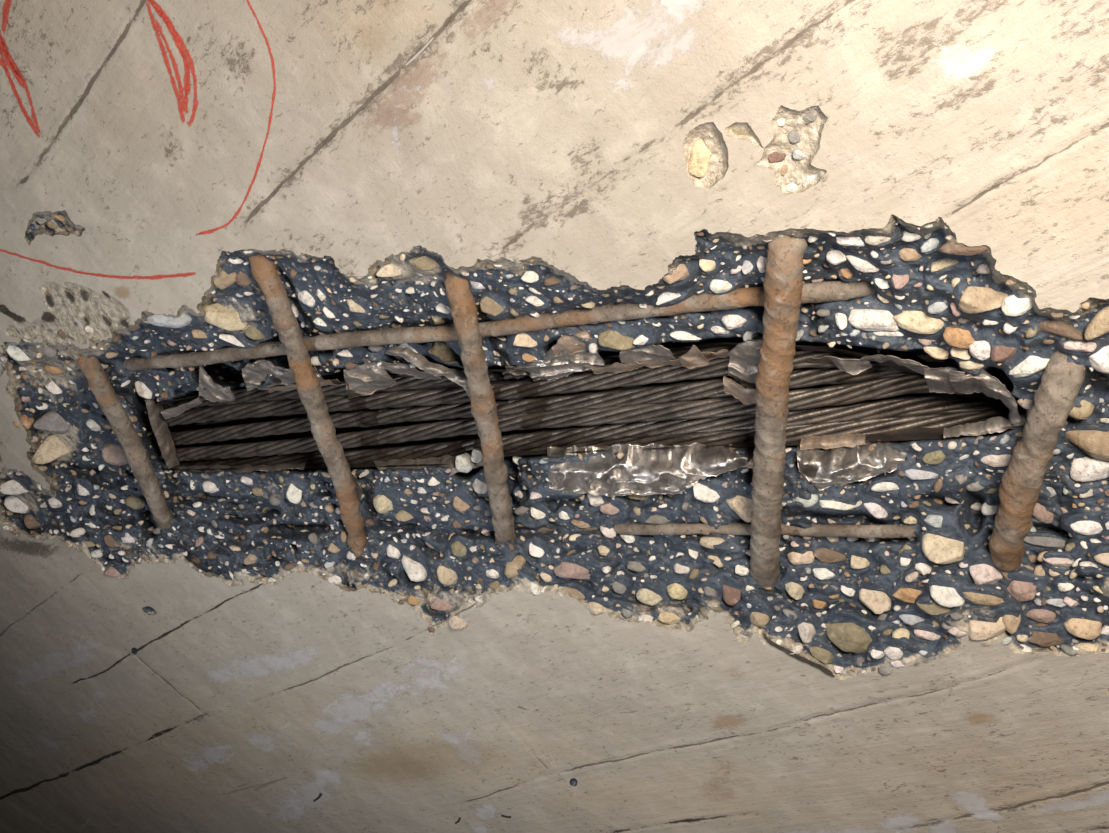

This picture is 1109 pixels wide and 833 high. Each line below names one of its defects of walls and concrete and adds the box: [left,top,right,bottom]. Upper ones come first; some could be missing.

crack [21,0,146,183]
crack [246,0,471,222]
spalling [0,210,1109,681]
crack [406,603,477,640]
crack [0,584,262,800]
crack [285,651,381,690]
crack [545,703,875,771]
crack [468,785,516,801]
crack [614,814,745,833]
crack [902,781,1109,829]